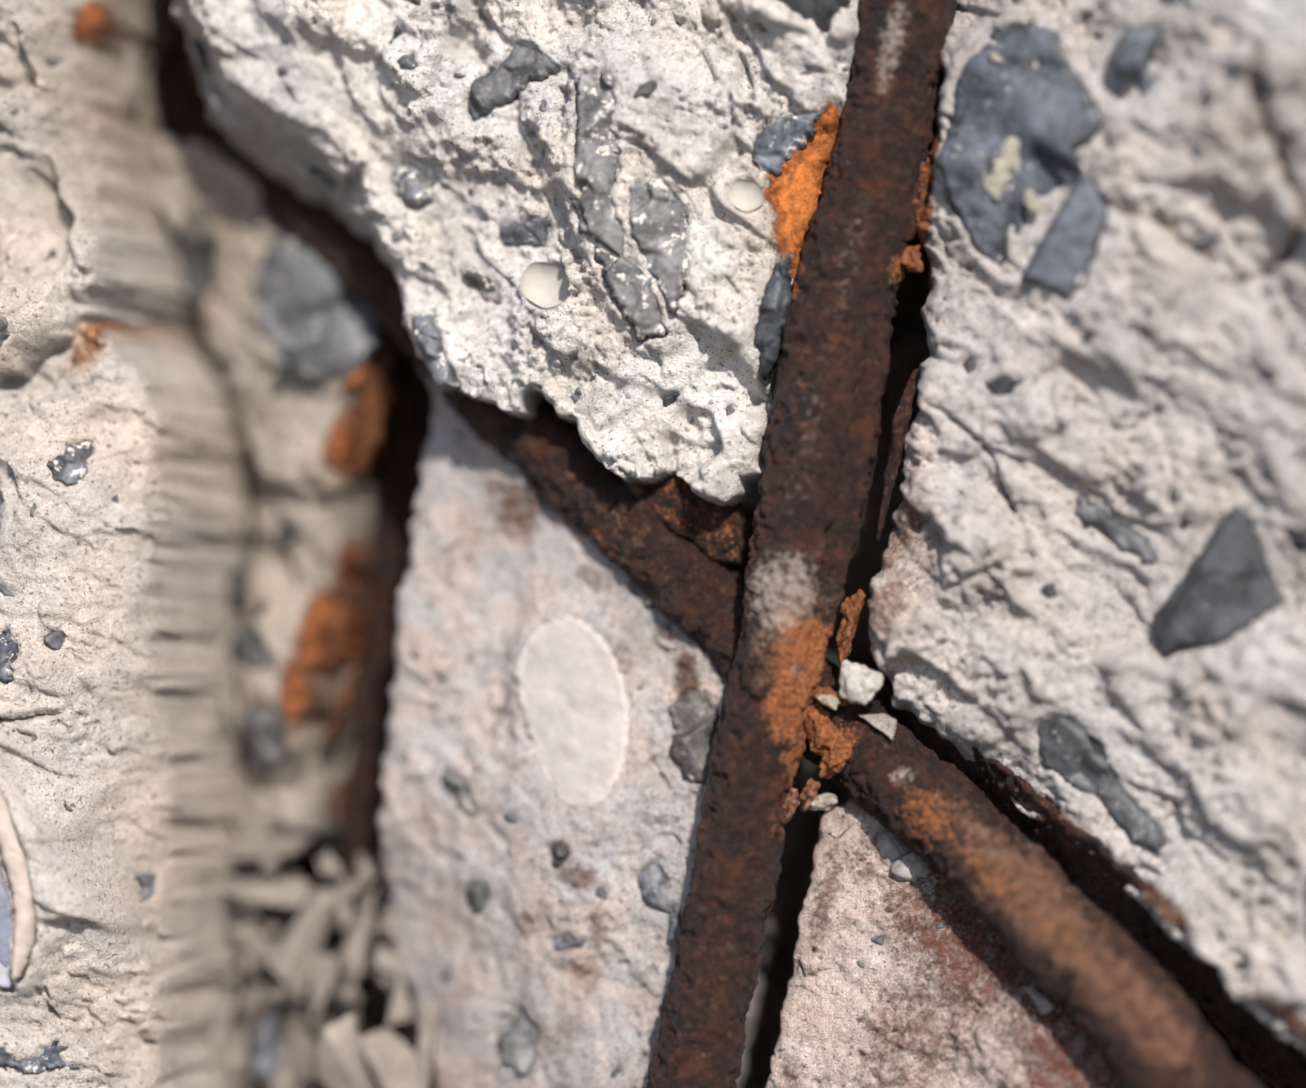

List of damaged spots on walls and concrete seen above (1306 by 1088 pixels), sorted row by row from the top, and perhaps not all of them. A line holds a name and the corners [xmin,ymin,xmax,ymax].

peeling [118,40,145,117]
corrosion [764,101,842,282]
corrosion [917,39,945,292]
corrosion [322,329,403,482]
corrosion [279,534,374,735]
spalling [148,0,745,1088]
corrosion [657,625,712,705]
corrosion [621,473,756,575]
spalling [646,0,1262,1088]
corrosion [880,678,1306,1088]